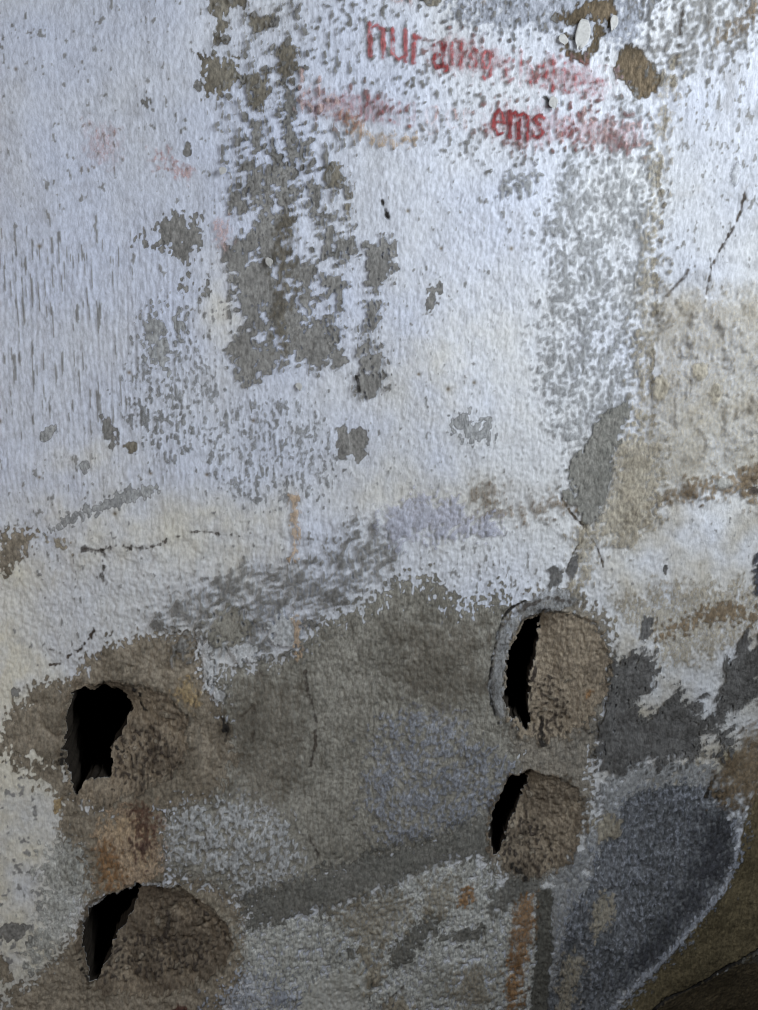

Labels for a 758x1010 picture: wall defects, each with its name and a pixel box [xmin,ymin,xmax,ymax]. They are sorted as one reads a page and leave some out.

crack [81,530,240,581]
peeling [0,507,758,1010]
crack [652,948,758,1010]